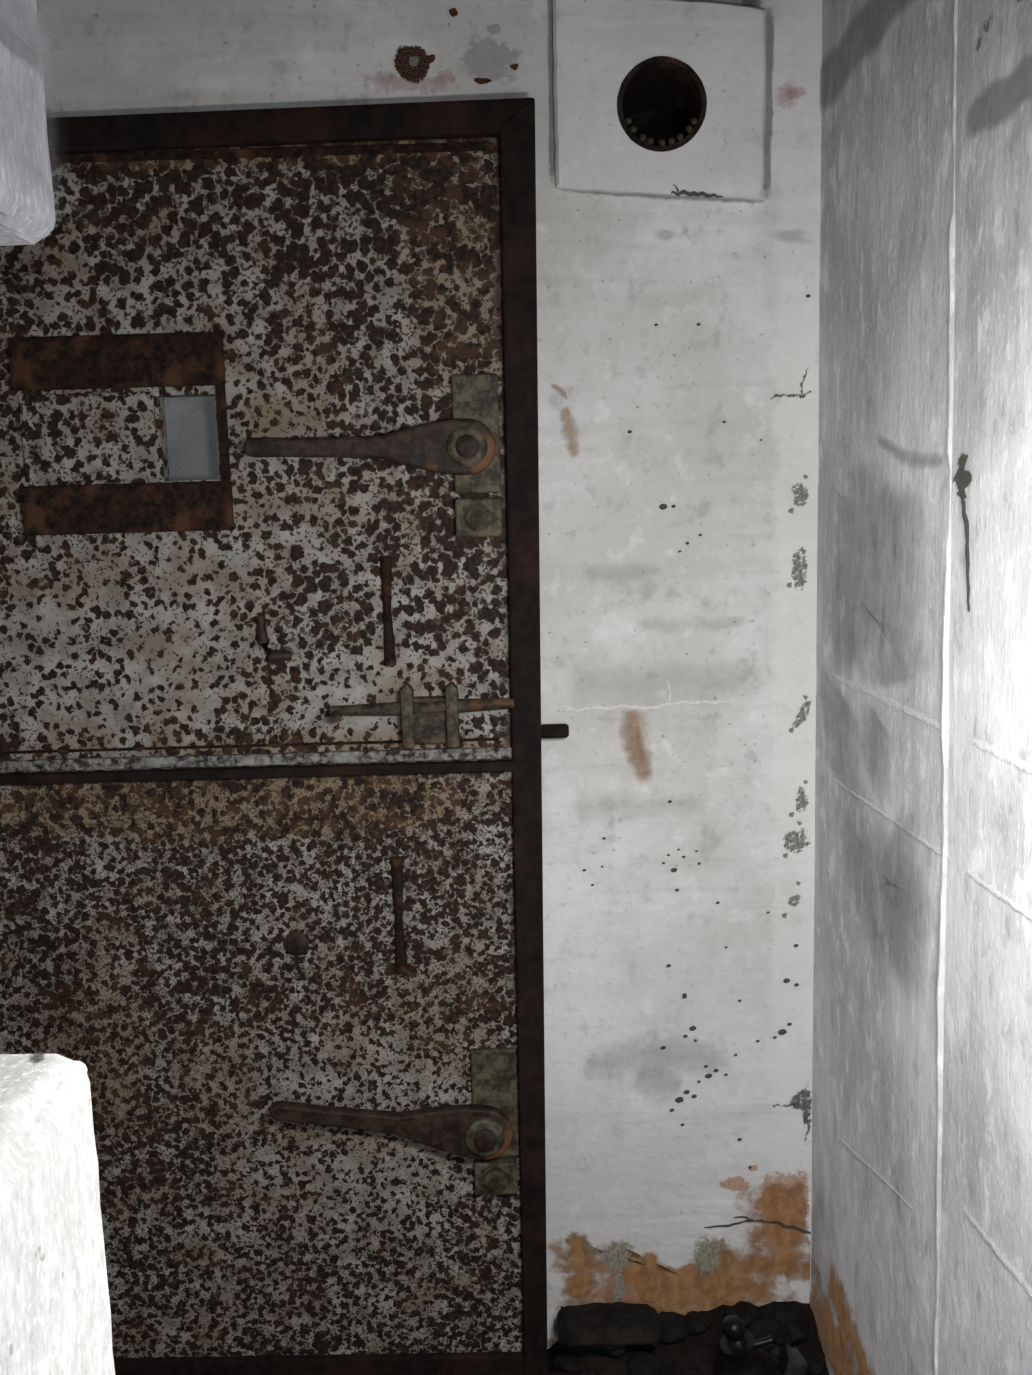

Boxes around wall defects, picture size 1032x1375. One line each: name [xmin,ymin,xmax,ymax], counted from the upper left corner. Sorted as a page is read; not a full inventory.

rust [628,712,646,774]
spalling [670,1065,728,1126]
peeling [720,1165,810,1235]
peeling [571,1232,633,1302]
peeling [694,1237,724,1275]
rust [552,1183,871,1375]